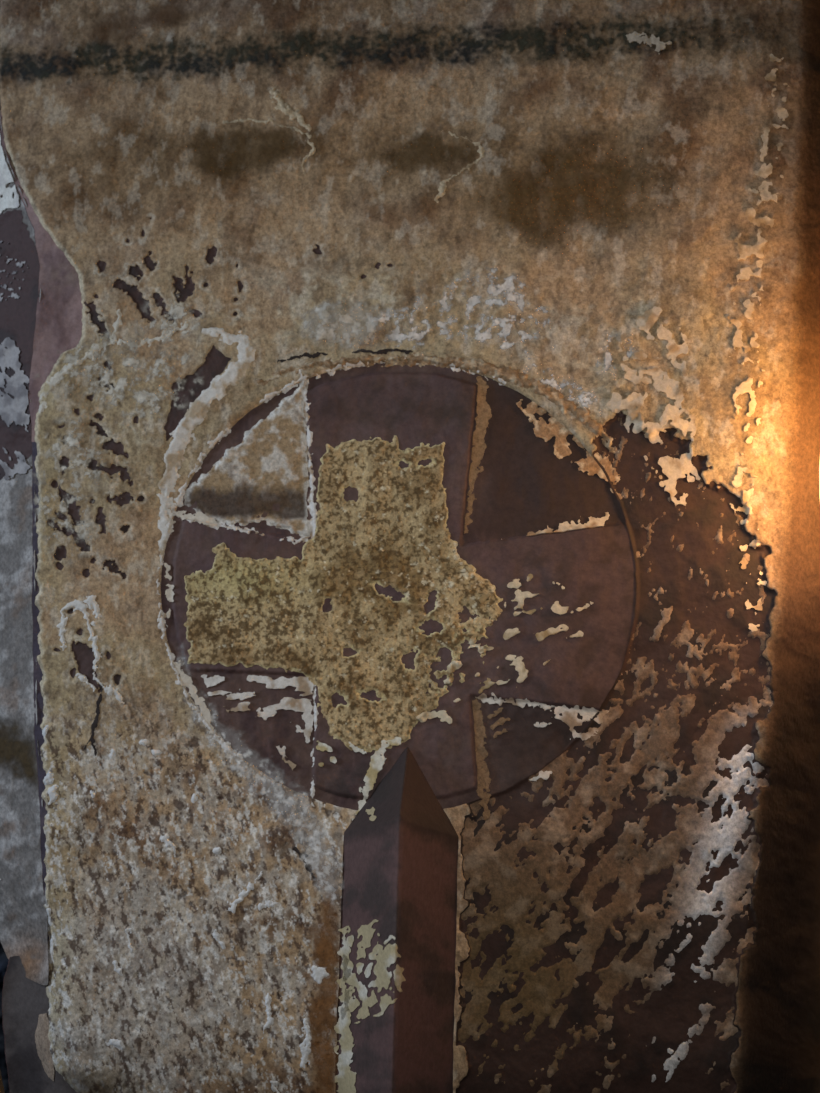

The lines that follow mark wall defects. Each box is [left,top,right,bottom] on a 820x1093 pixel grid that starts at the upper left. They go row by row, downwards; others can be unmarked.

peeling [625,31,672,55]
flaking render [113,251,208,323]
peeling [164,345,231,441]
peeling [0,110,144,963]
peeling [164,563,175,618]
peeling [168,511,217,534]
peeling [416,54,789,1093]
peeling [172,660,337,767]
peeling [349,737,402,821]
peeling [2,956,76,1093]
peeling [299,1018,312,1069]
peeling [311,919,405,1093]